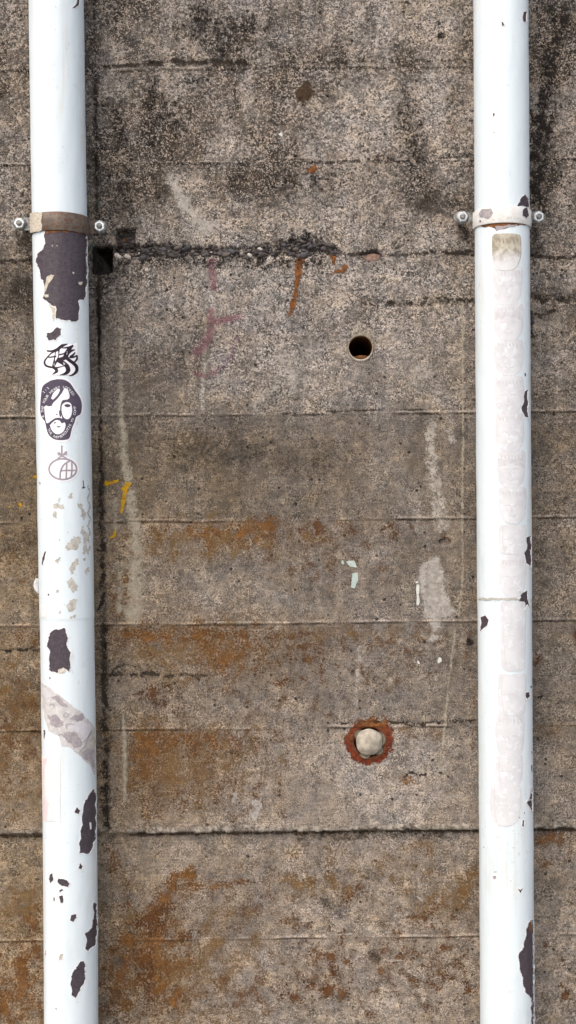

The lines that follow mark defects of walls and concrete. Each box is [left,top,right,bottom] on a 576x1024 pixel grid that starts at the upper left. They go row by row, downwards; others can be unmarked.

leakage [529,0,576,214]
rust [289,253,305,316]
leakage [414,301,465,642]
rust [95,570,475,826]
rust [98,837,480,1024]